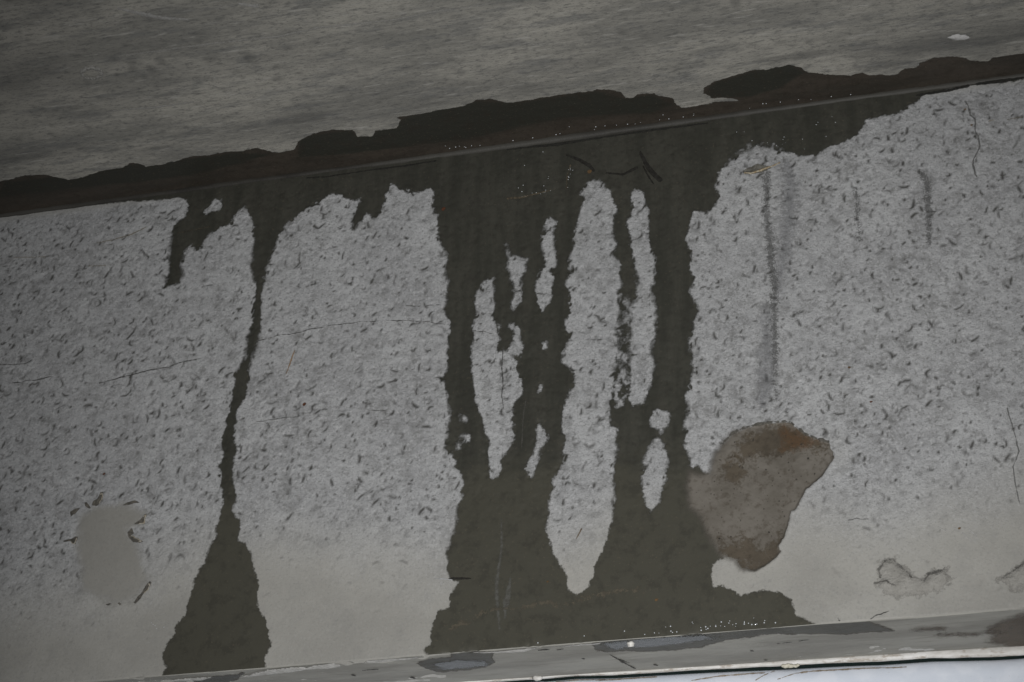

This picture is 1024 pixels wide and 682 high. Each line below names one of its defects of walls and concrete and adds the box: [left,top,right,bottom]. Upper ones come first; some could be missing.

leakage [0,54,1024,214]
crack [507,122,708,150]
crack [916,77,1023,177]
leakage [121,88,947,675]